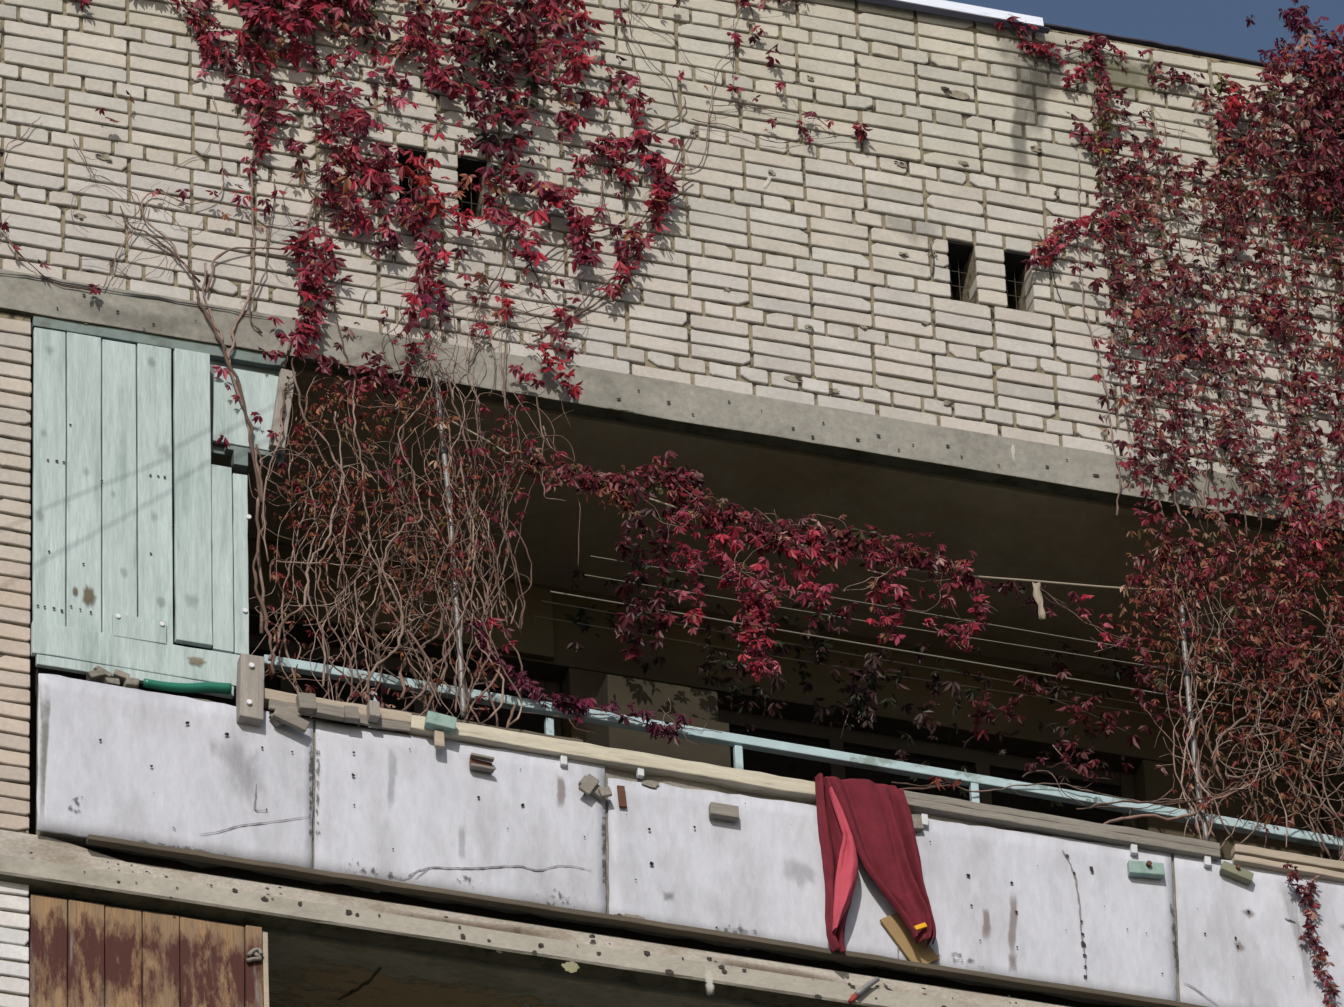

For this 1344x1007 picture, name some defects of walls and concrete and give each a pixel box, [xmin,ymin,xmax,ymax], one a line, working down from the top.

crack [203,816,308,834]
crack [388,865,591,880]
crack [1062,850,1094,980]
crack [338,967,381,1000]